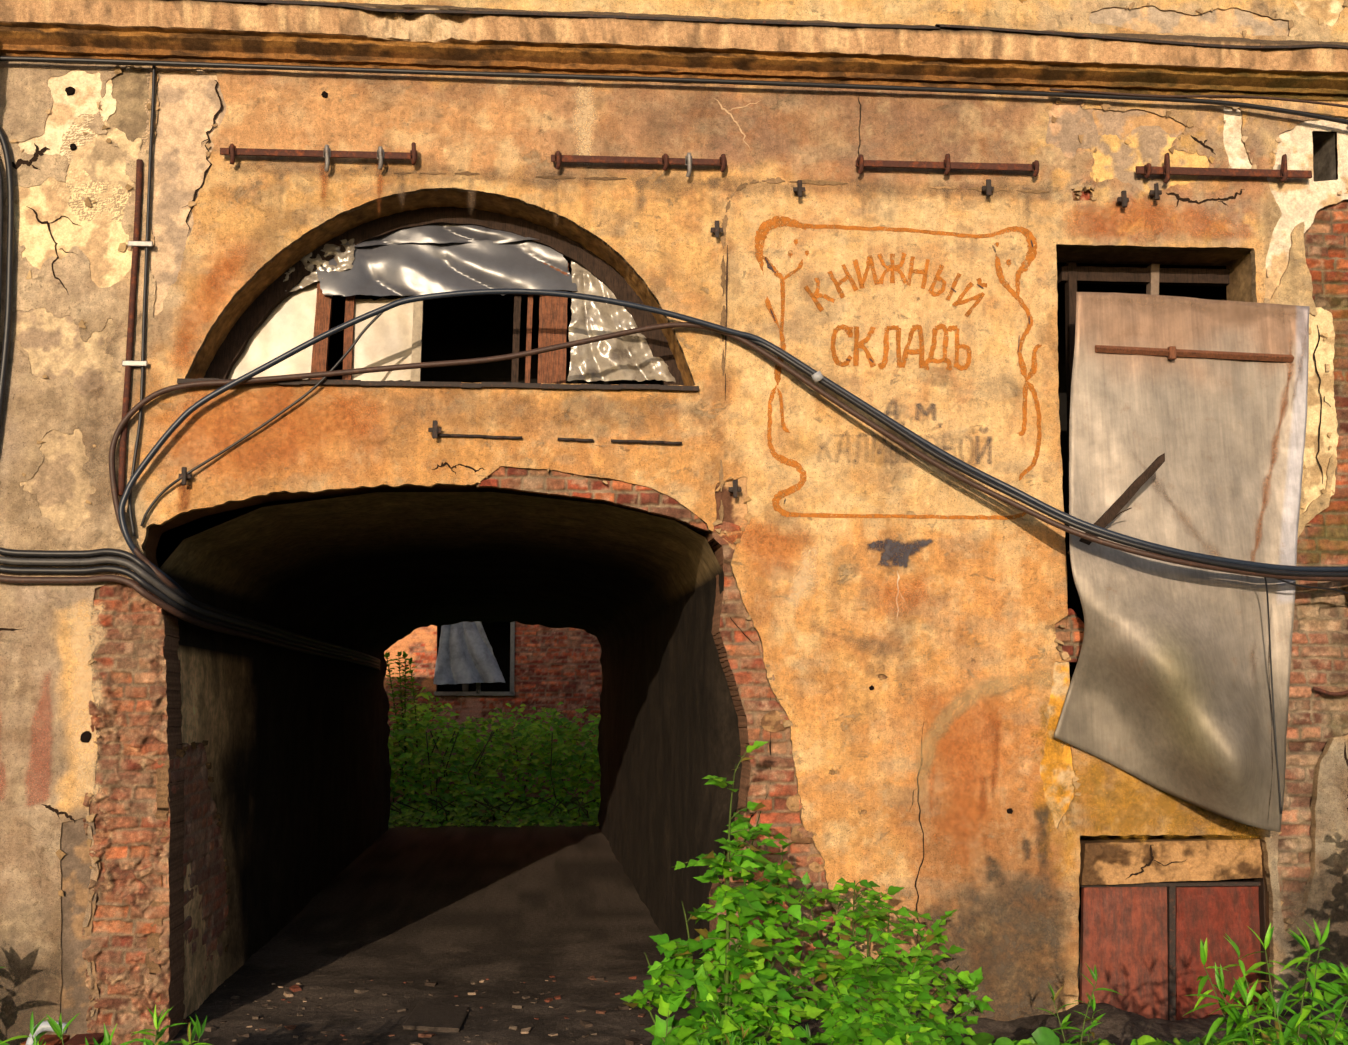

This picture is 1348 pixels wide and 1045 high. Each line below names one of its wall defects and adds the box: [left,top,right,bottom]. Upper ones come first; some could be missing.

crack [12,143,49,170]
crack [26,206,80,295]
peeling [5,65,226,318]
crack [184,80,223,237]
crack [1166,189,1245,208]
flaking render [1040,98,1348,929]
flaking render [55,573,231,1045]
flaking render [476,466,844,1025]
crack [910,723,924,942]
crack [1340,742,1348,811]